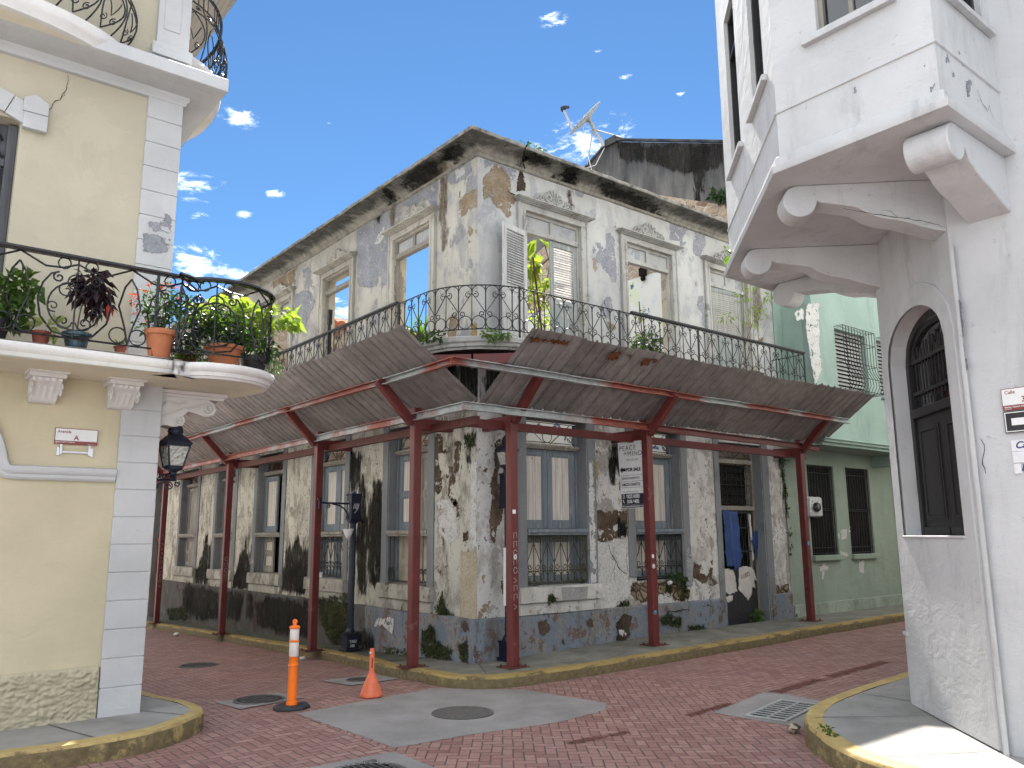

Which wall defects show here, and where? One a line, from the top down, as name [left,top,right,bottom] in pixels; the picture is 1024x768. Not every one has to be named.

peeling [142,214,172,254]
damp [375,141,464,250]
peeling [356,159,526,293]
damp [516,150,582,204]
mould [599,177,662,216]
damp [618,142,723,201]
crack [844,208,943,227]
peeling [795,302,822,384]
mould [182,532,308,638]
mould [350,448,382,595]
flaking render [435,434,505,550]
peeling [589,462,718,604]